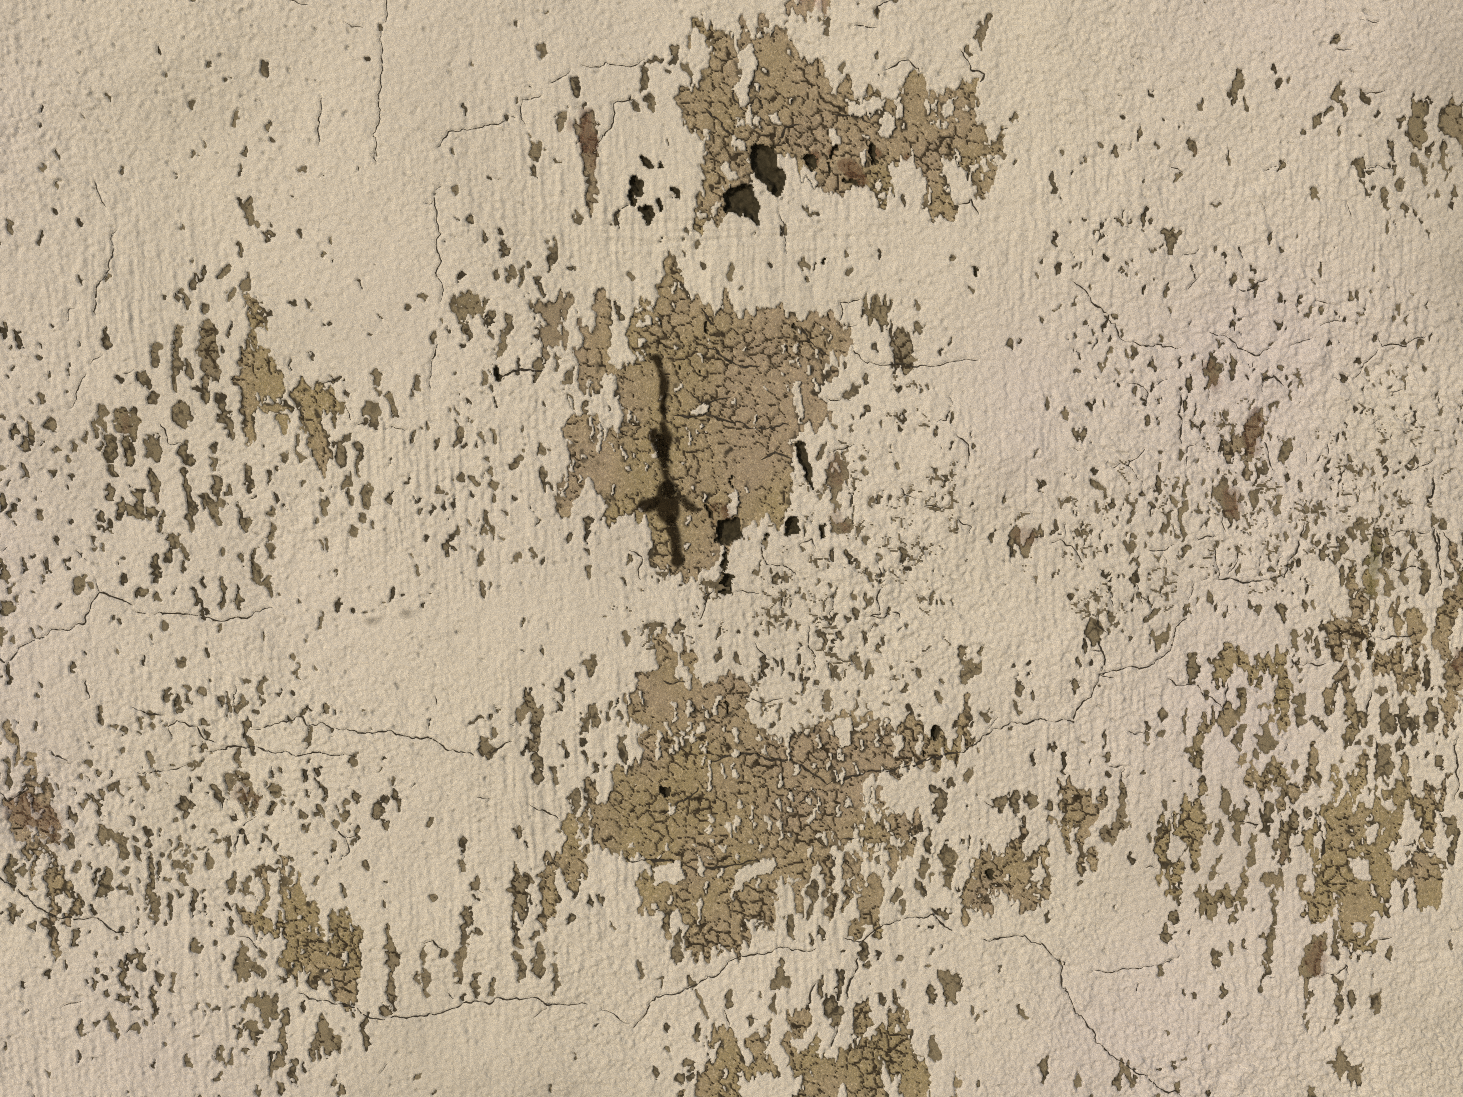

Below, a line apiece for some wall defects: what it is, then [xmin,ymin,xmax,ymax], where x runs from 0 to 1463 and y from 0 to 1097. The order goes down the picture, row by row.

peeling [260,60,269,78]
peeling [237,196,276,243]
leakage [639,354,696,566]
peeling [410,0,1463,1097]
crack [167,716,474,757]
crack [0,877,128,933]
peeling [0,586,496,1097]
crack [299,913,1180,1095]